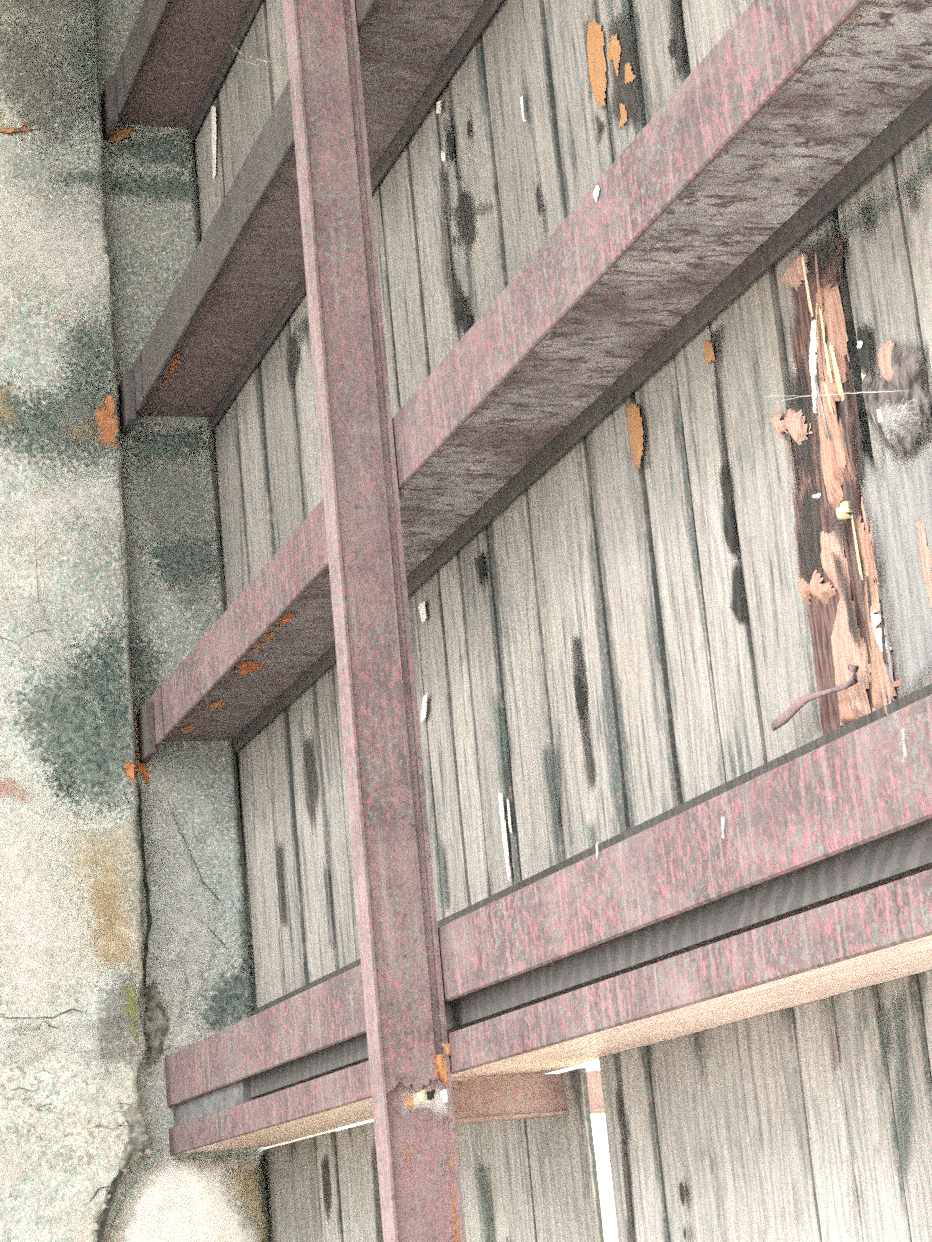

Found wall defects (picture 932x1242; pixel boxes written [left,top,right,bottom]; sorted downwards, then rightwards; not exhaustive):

rust [0,120,43,134]
leakage [0,0,200,203]
peeling [585,16,638,139]
rust [96,395,118,445]
peeling [626,403,647,469]
rust [238,613,294,675]
leakage [4,614,167,820]